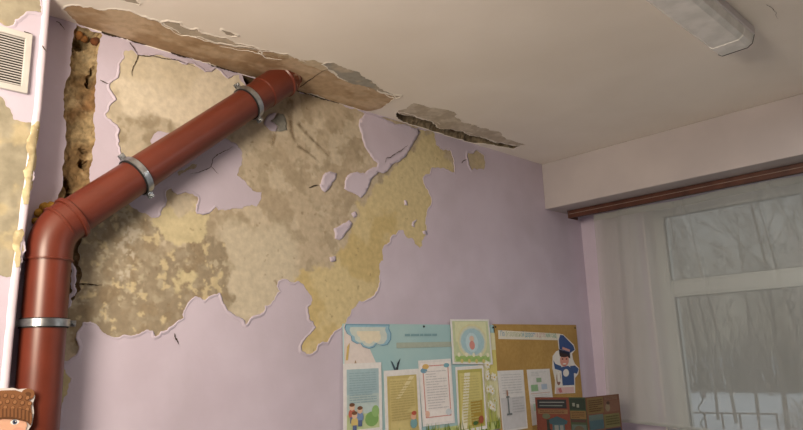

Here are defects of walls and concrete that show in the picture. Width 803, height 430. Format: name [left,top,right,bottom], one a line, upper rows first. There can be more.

crack [102,32,241,74]
crack [297,69,337,103]
peeling [0,95,40,279]
peeling [58,0,526,418]